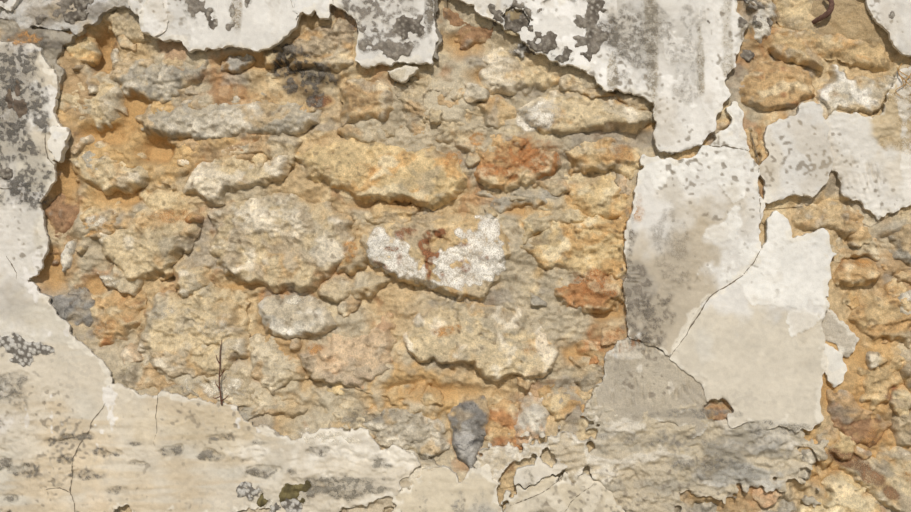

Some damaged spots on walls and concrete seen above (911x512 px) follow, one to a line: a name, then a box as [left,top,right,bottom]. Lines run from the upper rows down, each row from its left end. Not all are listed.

spalling [30,0,673,489]
crack [669,251,760,358]
spalling [622,0,911,512]
flaking render [0,458,39,477]
crack [46,404,105,512]